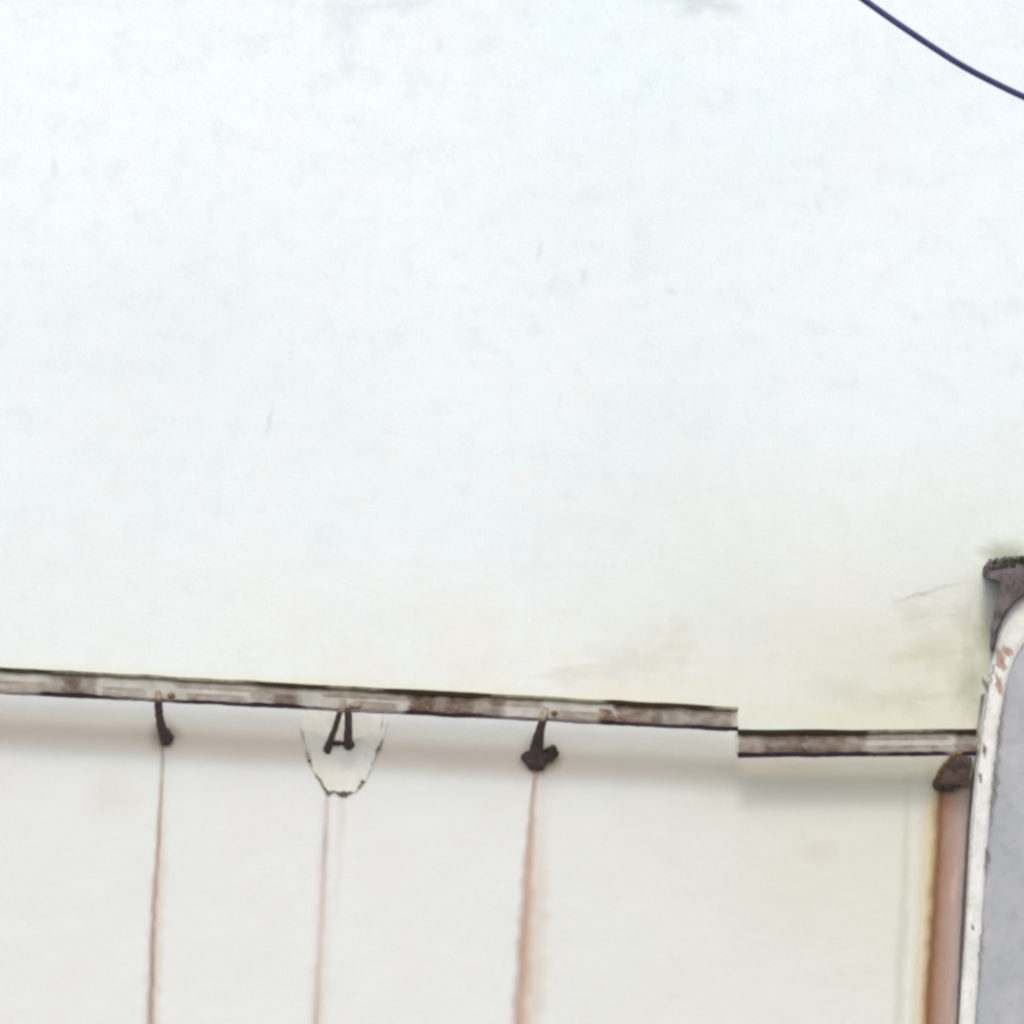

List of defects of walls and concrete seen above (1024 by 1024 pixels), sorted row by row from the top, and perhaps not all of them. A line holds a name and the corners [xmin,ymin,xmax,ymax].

corrosion [915,770,974,1024]